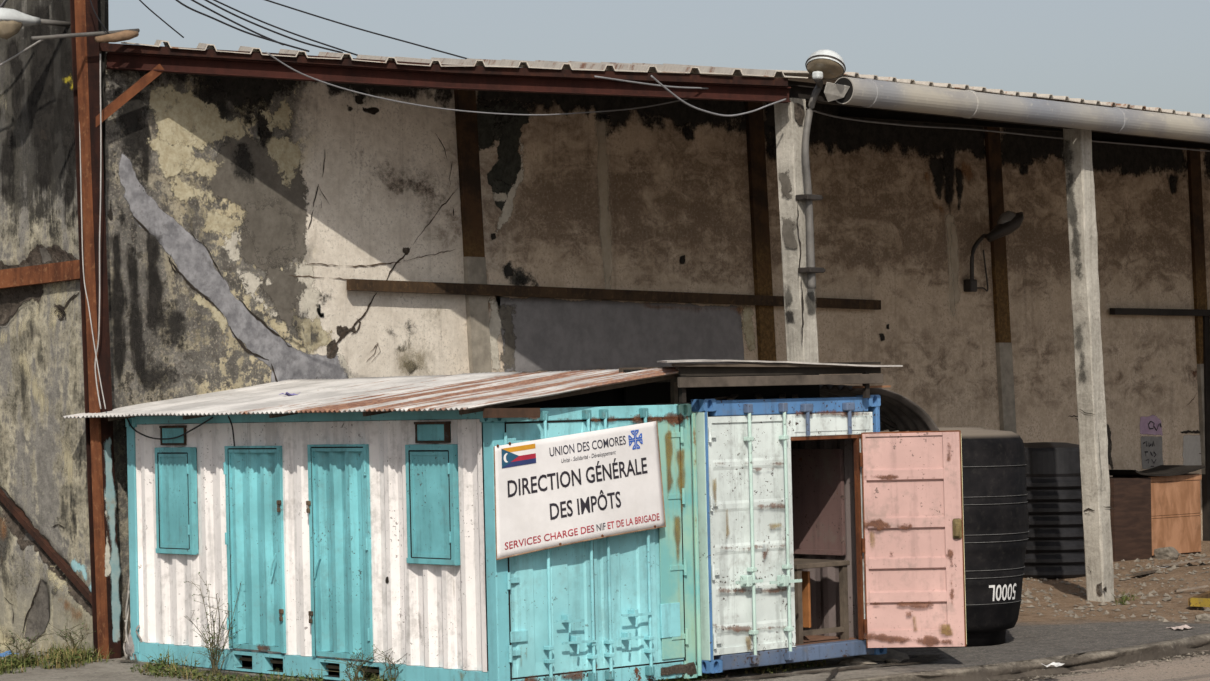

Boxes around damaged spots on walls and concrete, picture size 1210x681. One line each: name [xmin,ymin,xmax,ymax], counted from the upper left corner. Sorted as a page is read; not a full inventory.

spalling [0,284,66,325]
water stain [0,0,76,220]
spalling [0,244,77,270]
flaking render [148,83,355,378]
crack [289,133,457,379]
peeling [476,101,529,240]
water stain [806,102,986,316]
water stain [1000,128,1081,276]
water stain [1092,142,1188,195]
rust [591,413,689,555]
rust [863,519,912,540]
rust [864,601,952,646]